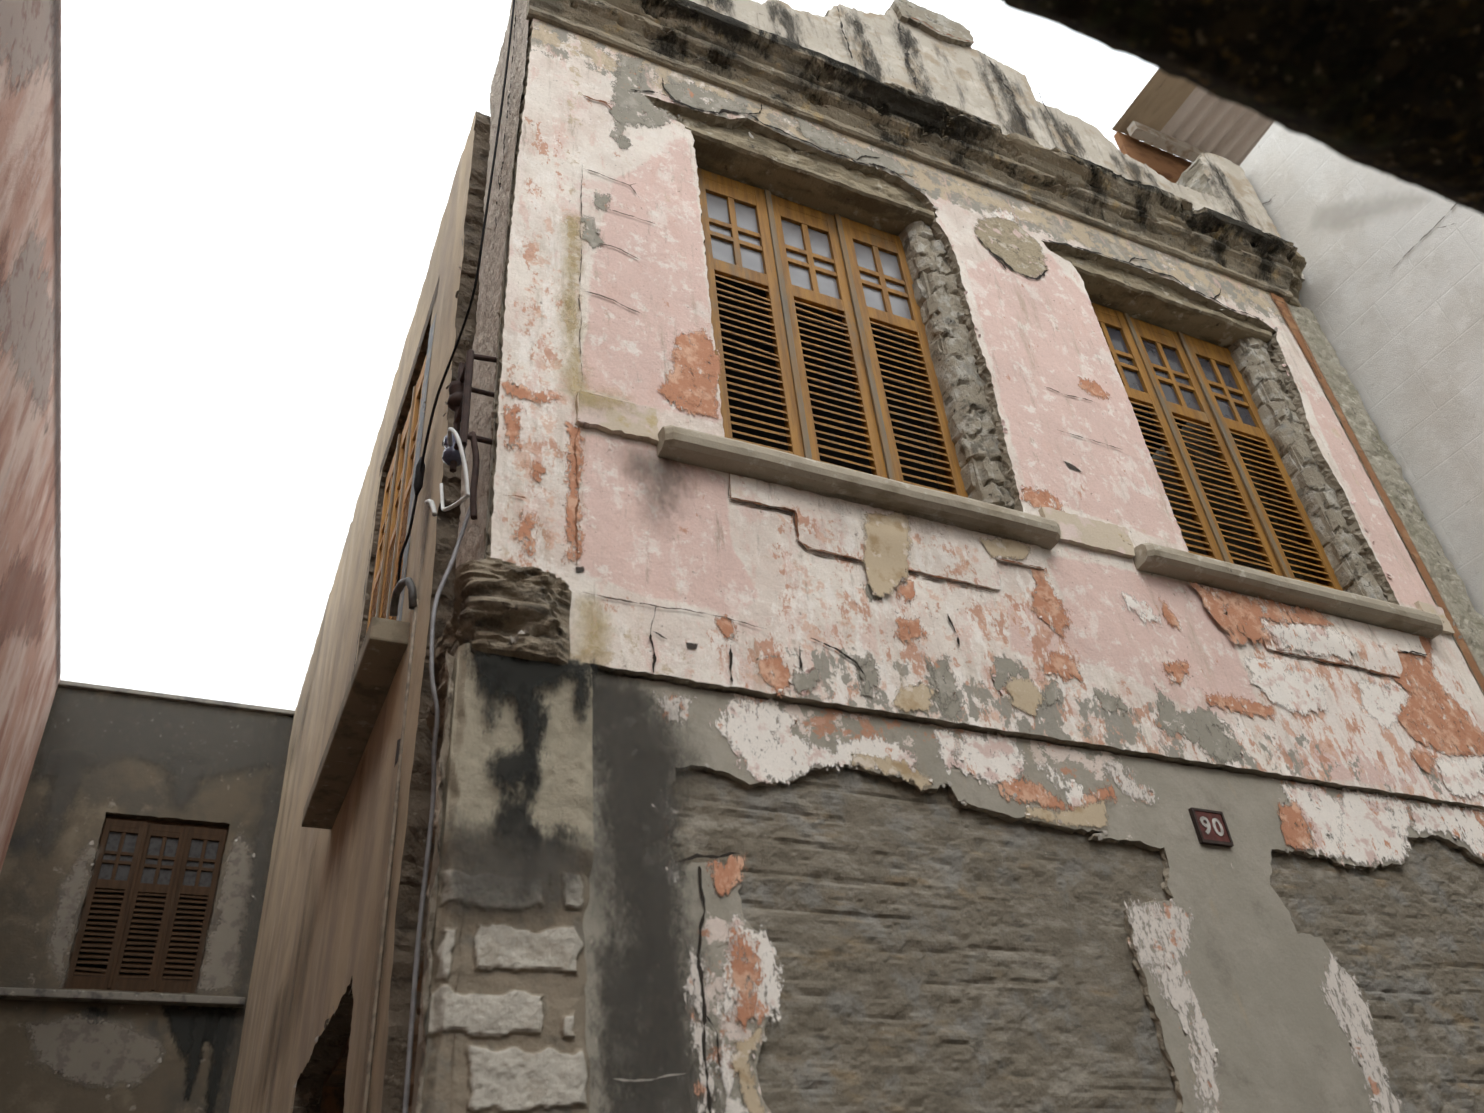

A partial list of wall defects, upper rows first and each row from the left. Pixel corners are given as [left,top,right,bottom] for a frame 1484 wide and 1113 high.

water stain [31,0,293,1113]
spalling [408,0,588,1113]
water stain [448,640,720,1113]
peeling [579,192,612,248]
spalling [609,54,1065,512]
spalling [652,511,1223,1113]
water stain [641,0,1295,281]
peeling [979,537,1357,764]
spalling [974,207,1391,602]
spalling [1270,627,1484,1113]
spalling [1286,302,1484,696]